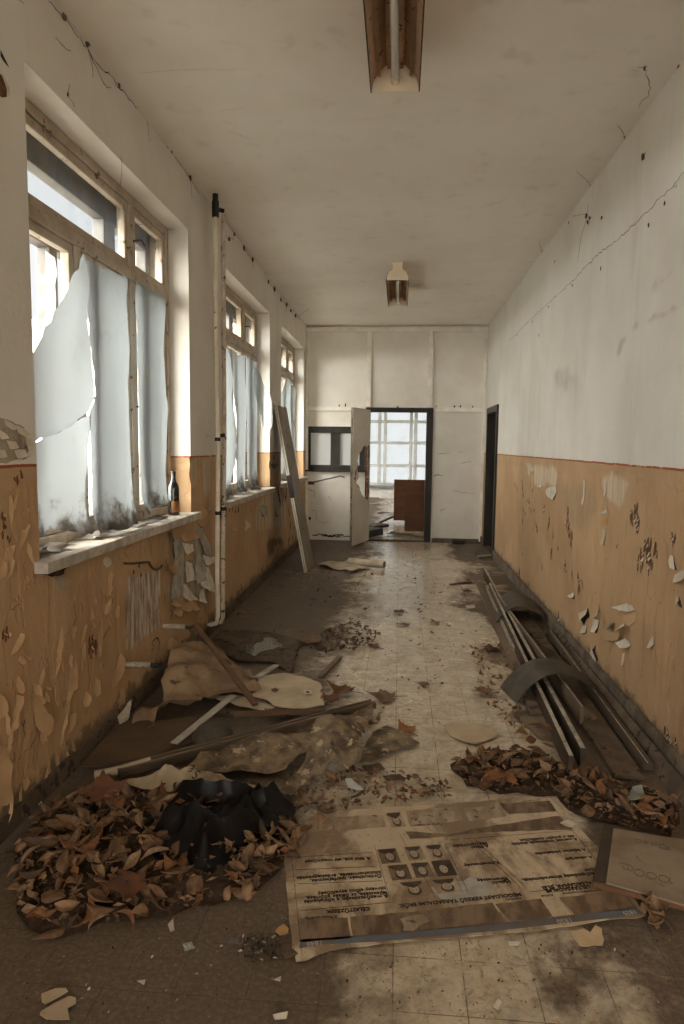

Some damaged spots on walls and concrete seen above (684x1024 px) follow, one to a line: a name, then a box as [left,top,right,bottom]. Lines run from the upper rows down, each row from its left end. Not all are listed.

crack [20,0,137,108]
crack [510,172,684,340]
peeling [0,418,35,580]
peeling [515,483,557,529]
peeling [629,502,684,608]
peeling [0,501,251,821]
peeling [578,603,637,667]